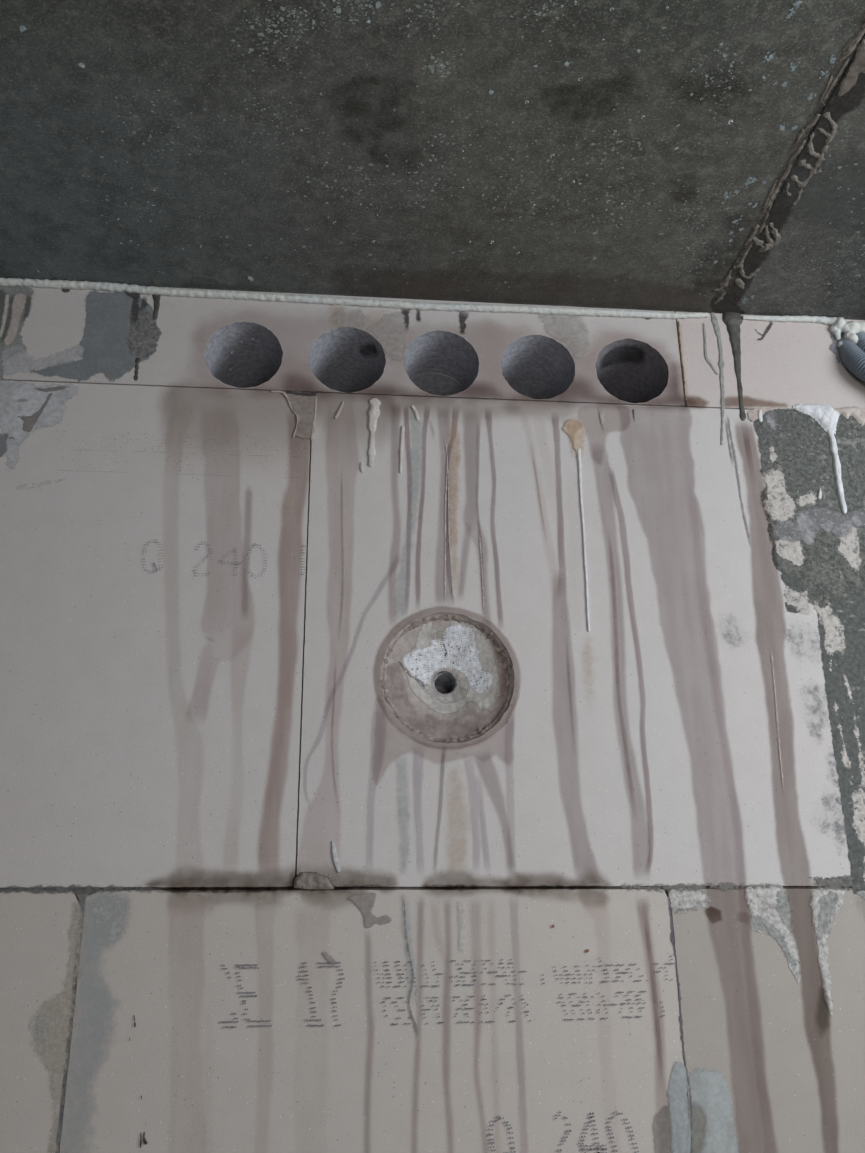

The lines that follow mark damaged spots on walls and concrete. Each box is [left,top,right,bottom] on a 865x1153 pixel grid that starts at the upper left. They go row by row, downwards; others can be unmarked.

water stain [333,271,462,359]
water stain [478,276,581,304]
water stain [598,287,674,311]
water stain [710,295,754,445]
peeling [0,380,78,469]
water stain [360,398,381,473]
water stain [577,448,590,632]
peeling [763,446,865,571]
peeling [785,590,846,671]
water stain [172,883,291,893]
water stain [621,882,771,893]
spalling [744,883,803,984]